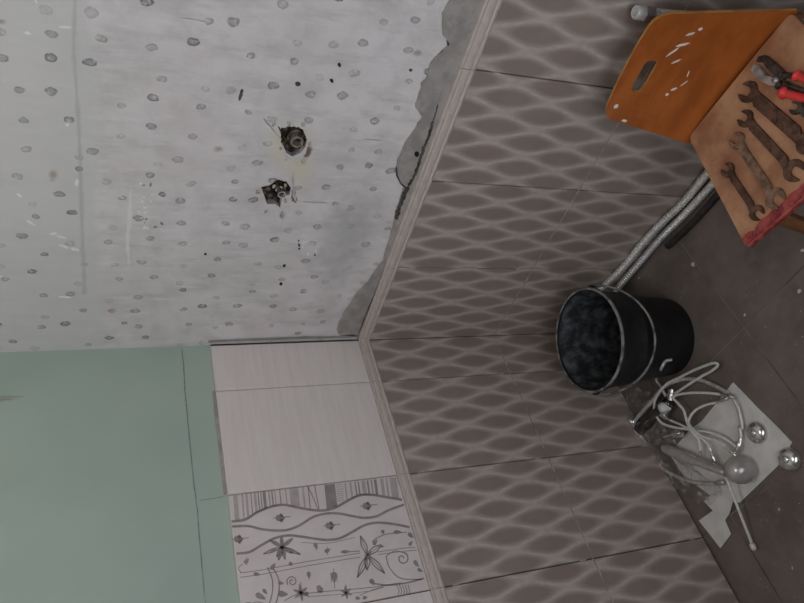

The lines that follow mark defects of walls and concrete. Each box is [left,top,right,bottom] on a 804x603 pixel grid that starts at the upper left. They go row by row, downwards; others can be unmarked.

flaking render [272,121,312,161]
flaking render [255,180,294,213]